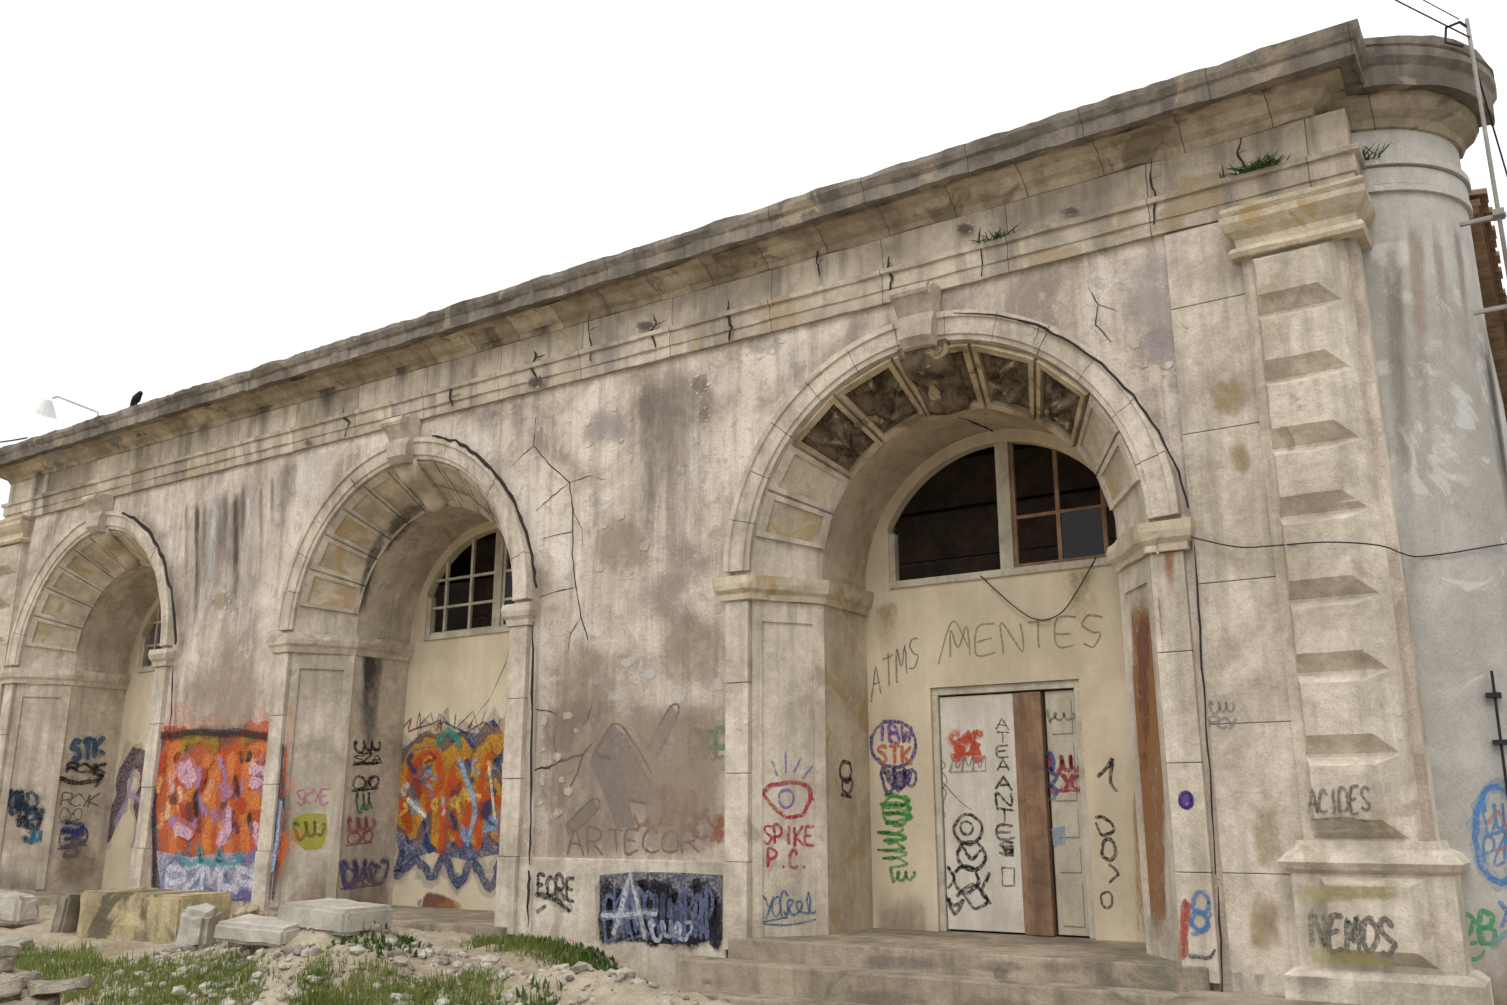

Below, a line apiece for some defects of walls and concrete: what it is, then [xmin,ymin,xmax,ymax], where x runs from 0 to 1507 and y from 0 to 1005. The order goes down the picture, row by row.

crack [1149,158,1161,225]
crack [978,225,990,277]
crack [651,315,666,348]
crack [725,300,733,341]
crack [958,287,1189,508]
damp [195,480,286,582]
crack [432,349,605,927]
rust [1132,599,1165,929]
crack [1194,545,1223,992]